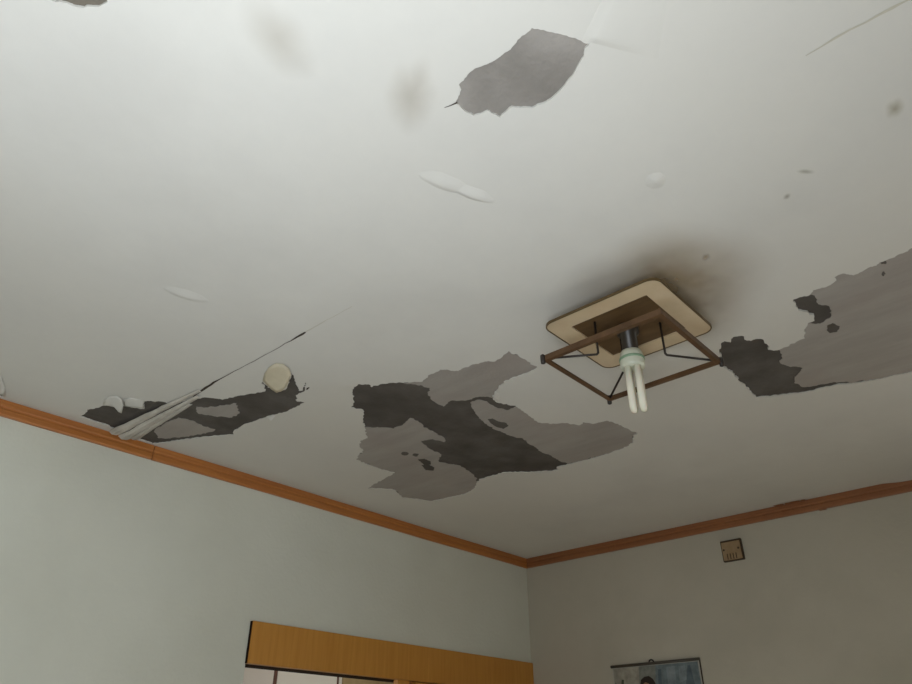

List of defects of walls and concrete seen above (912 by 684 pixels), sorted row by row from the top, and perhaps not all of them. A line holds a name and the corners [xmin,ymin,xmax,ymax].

peeling [456,28,588,116]
crack [806,0,909,56]
crack [193,306,352,397]
peeling [719,248,912,397]
peeling [82,363,306,443]
peeling [352,351,636,501]